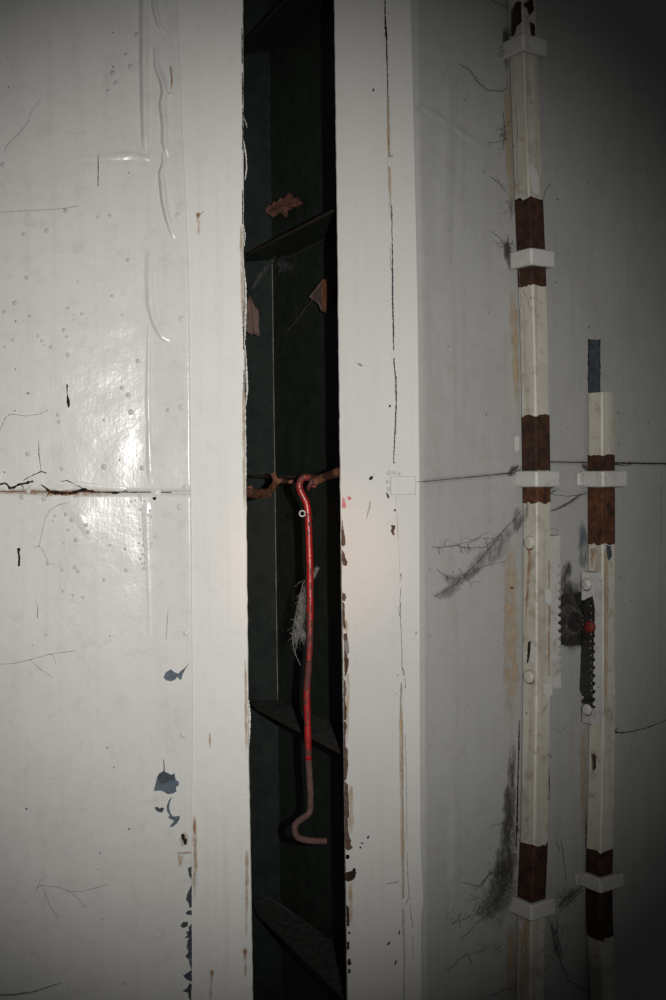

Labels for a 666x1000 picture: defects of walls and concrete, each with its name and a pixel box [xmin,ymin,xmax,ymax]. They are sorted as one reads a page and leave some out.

crack [384,0,393,167]
crack [389,205,398,472]
crack [0,440,142,561]
peeling [154,759,180,827]
peeling [164,665,188,681]
peeling [342,593,369,881]
crack [395,568,413,1000]
peeling [181,866,192,1000]